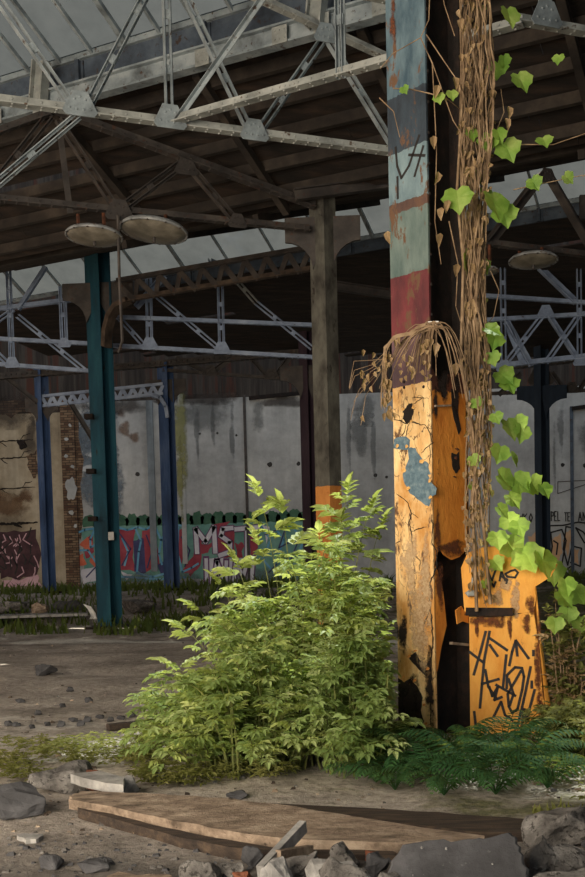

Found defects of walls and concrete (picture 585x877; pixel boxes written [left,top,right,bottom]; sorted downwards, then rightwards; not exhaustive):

peeling [401,403,415,424]
peeling [394,436,437,509]
peeling [398,534,431,732]